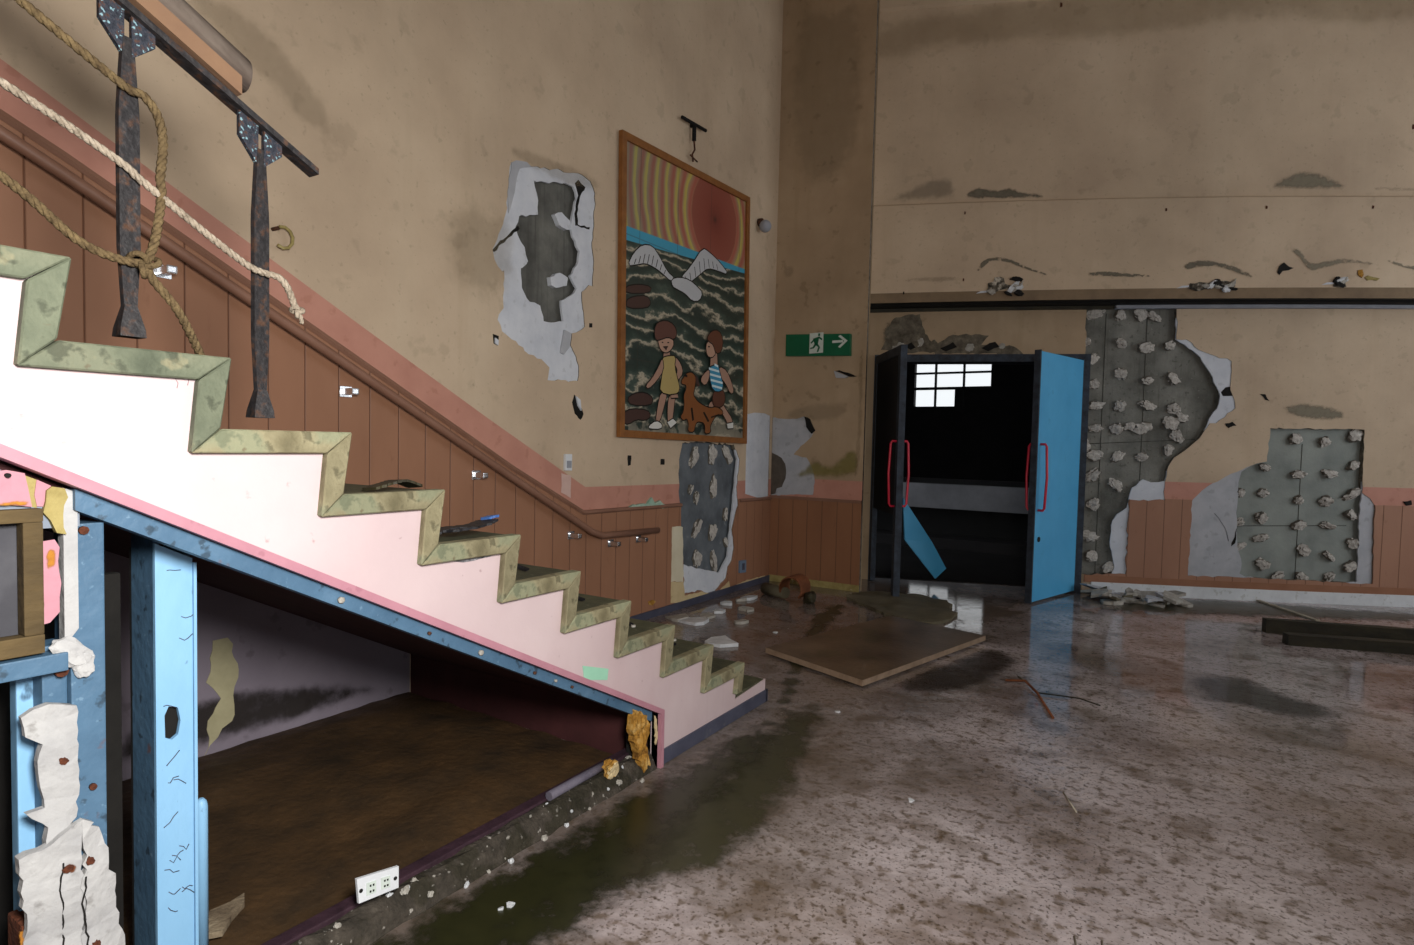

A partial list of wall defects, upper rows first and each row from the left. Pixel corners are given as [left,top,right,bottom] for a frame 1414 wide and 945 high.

spalling [493,160,595,420]
flaking render [978,276,1024,296]
flaking render [1178,279,1238,293]
flaking render [1322,269,1380,288]
flaking render [881,314,1023,354]
spalling [1081,309,1237,574]
spalling [628,413,815,605]
spalling [1188,428,1374,584]
peeling [49,636,95,678]
leakage [1199,678,1327,716]
peeling [8,702,125,945]